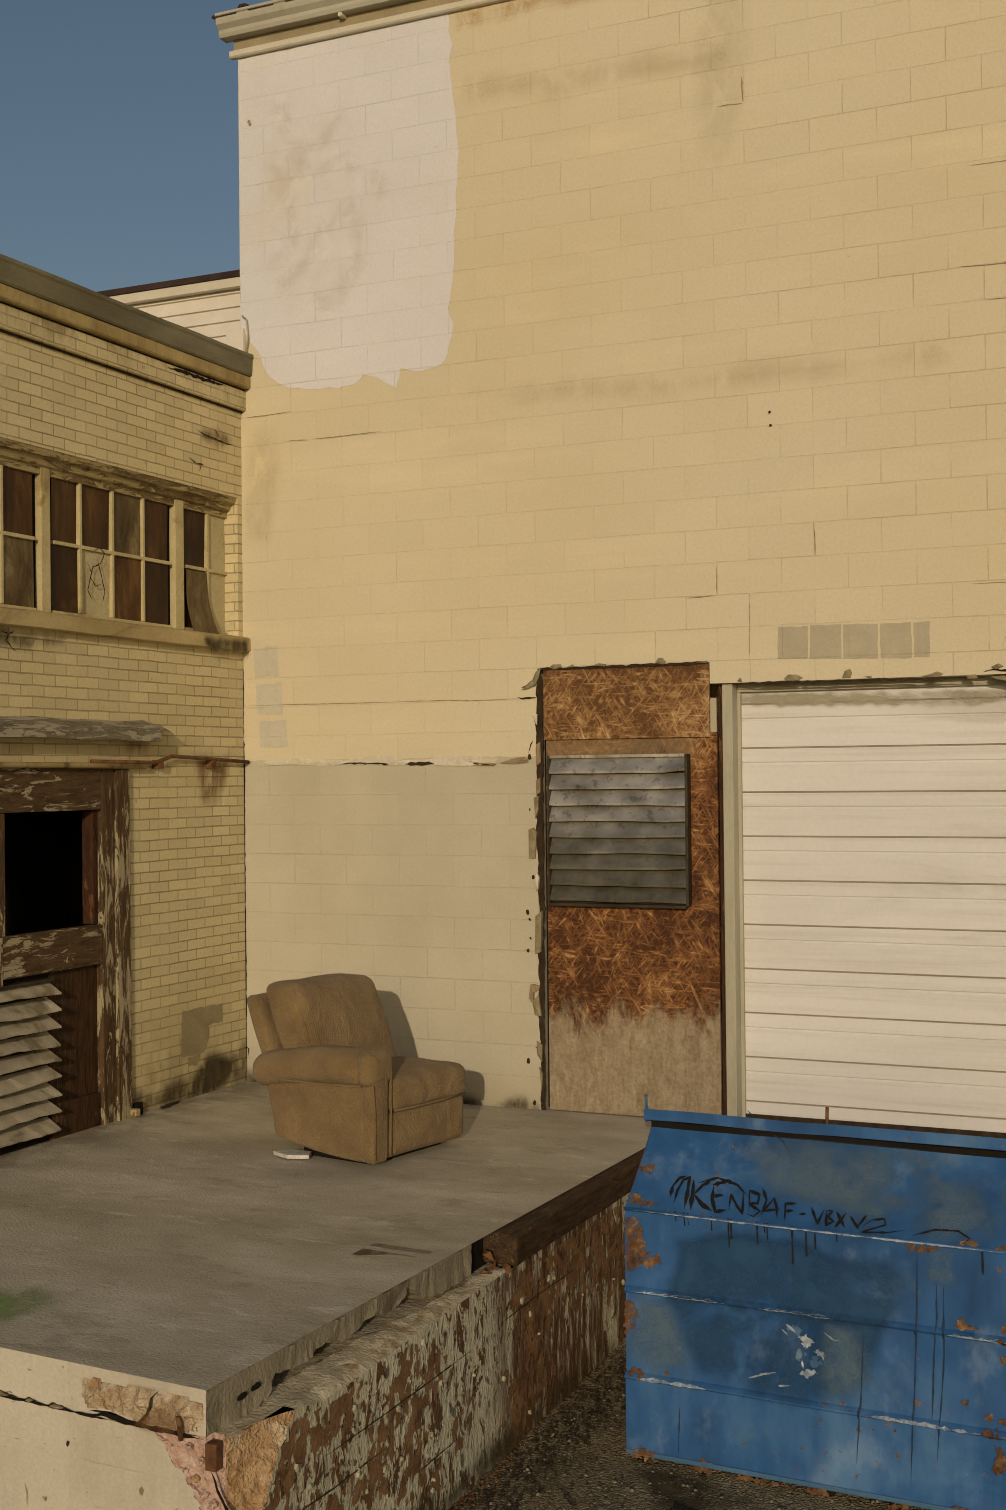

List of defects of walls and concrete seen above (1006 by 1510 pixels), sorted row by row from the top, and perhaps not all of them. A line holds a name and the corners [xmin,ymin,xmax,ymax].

spalling [722,638,1006,684]
spalling [263,658,707,1110]
spalling [0,1390,67,1409]
spalling [81,1200,627,1510]